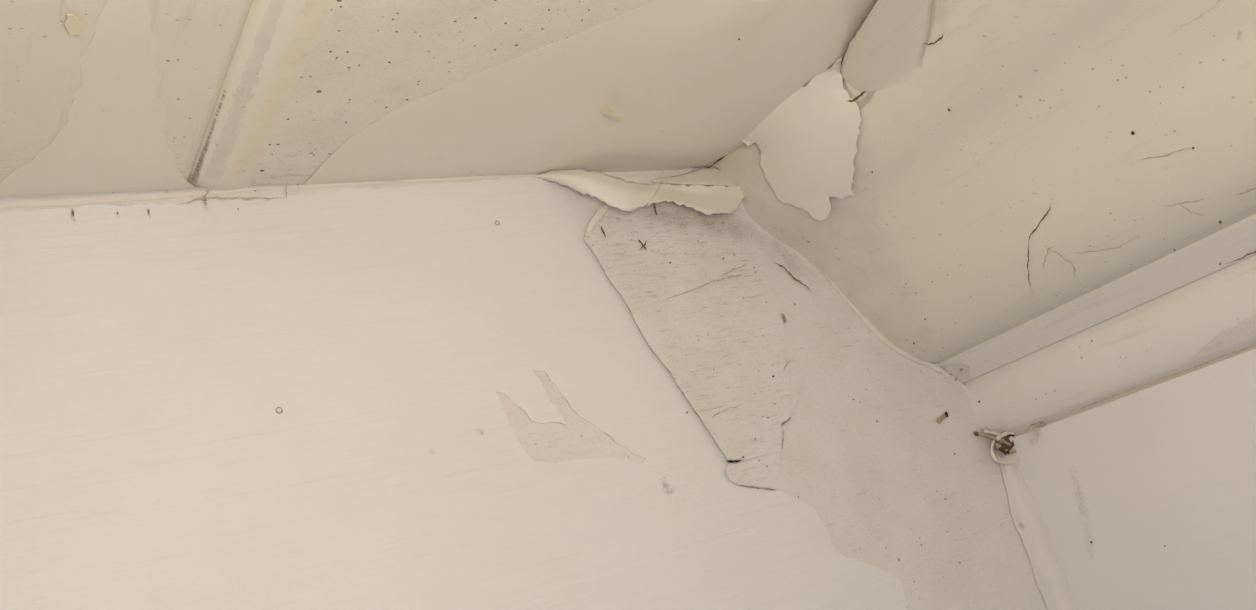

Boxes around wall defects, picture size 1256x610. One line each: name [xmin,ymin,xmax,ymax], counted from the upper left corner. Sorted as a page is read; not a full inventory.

peeling [532,0,1048,610]
crack [1027,209,1138,288]